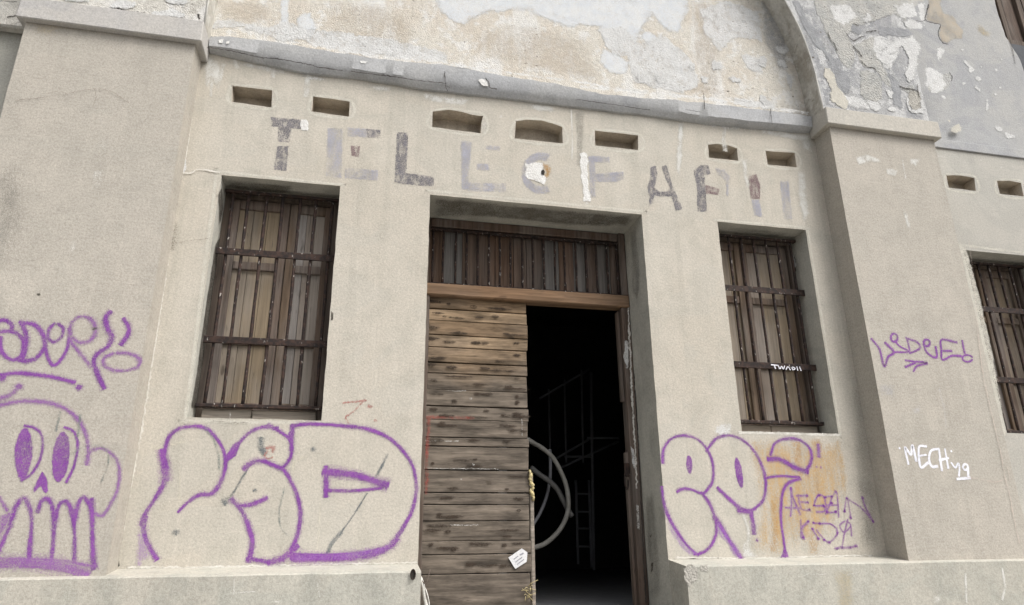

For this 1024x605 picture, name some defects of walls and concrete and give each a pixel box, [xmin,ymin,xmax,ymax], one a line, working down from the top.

peeling [280,0,809,115]
peeling [793,0,947,113]
rust [750,435,848,557]